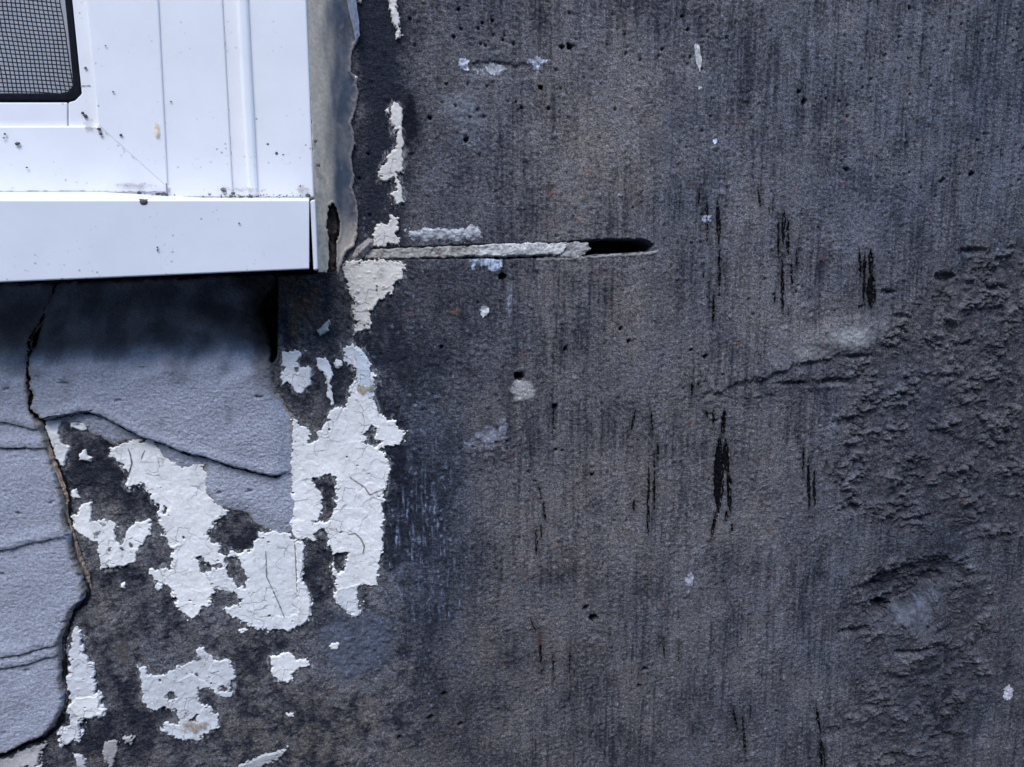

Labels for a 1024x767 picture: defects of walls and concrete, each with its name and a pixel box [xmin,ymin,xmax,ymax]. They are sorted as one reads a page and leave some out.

peeling [71,101,411,635]
peeling [45,419,93,469]
crack [0,283,291,757]
crack [265,542,297,618]
peeling [136,645,237,745]
peeling [267,650,314,685]